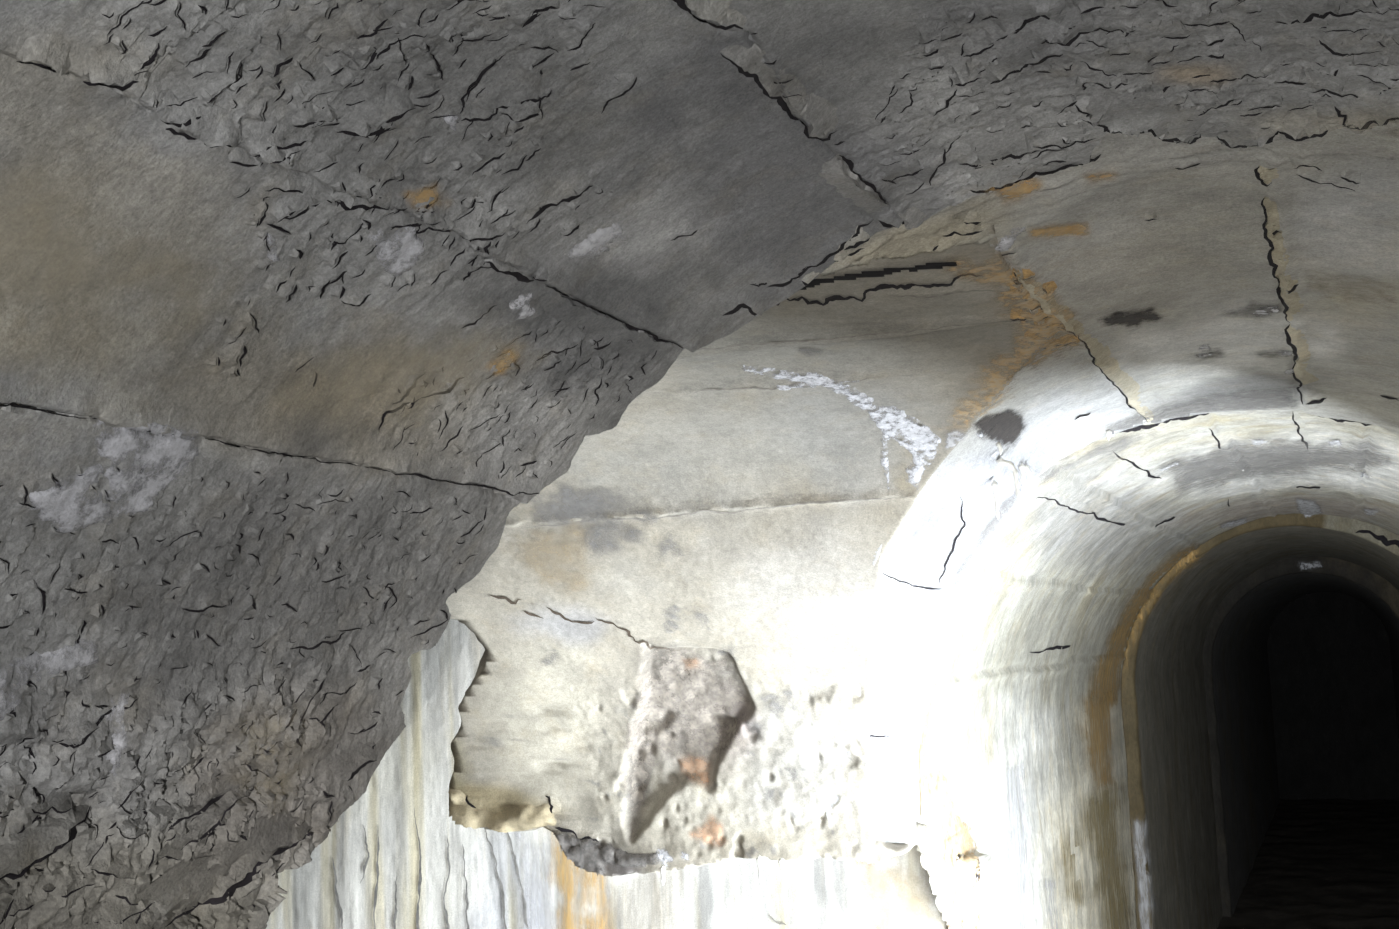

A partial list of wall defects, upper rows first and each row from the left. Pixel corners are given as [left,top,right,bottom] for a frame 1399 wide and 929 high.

spalling [92,0,605,307]
spalling [856,0,1399,195]
crack [482,0,1399,479]
crack [0,393,914,529]
water stain [743,365,1025,489]
water stain [1020,350,1295,479]
water stain [1160,440,1389,491]
crack [883,497,966,590]
spalling [0,446,487,929]
crack [492,596,696,675]
spalling [624,606,759,812]
rust [556,846,605,929]